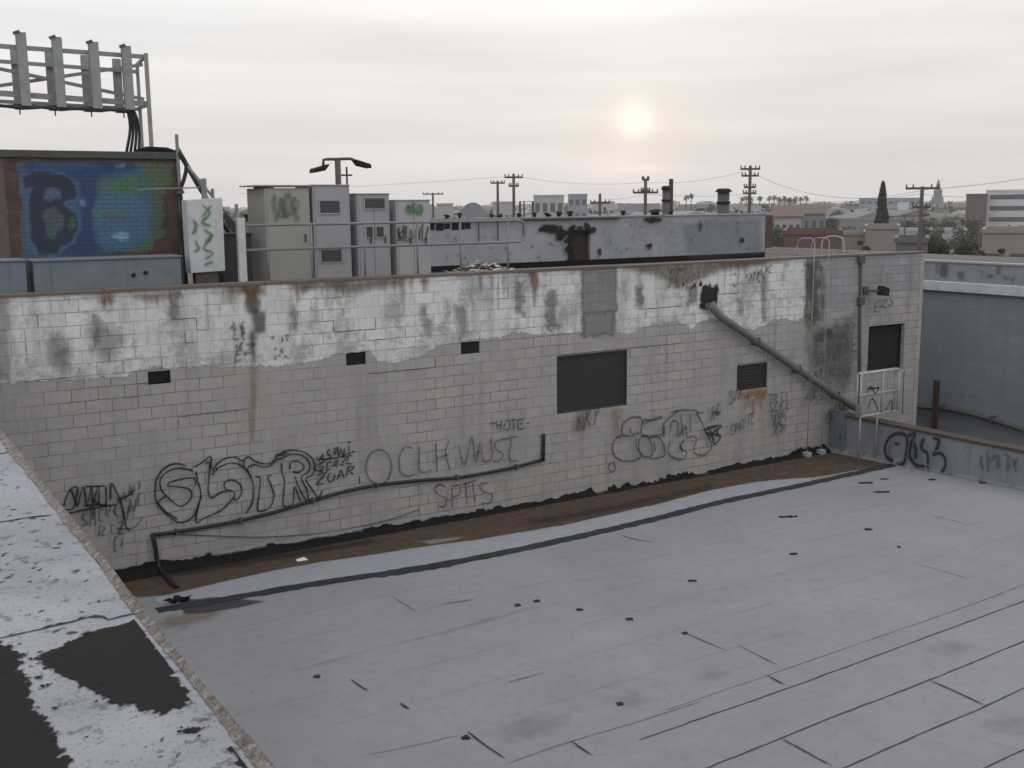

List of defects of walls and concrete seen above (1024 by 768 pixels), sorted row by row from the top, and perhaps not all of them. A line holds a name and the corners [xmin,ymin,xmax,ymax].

spalling [564,222,597,264]
peeling [515,284,525,315]
peeling [545,290,557,329]
peeling [581,268,617,338]
spalling [668,267,720,310]
peeling [0,620,192,768]